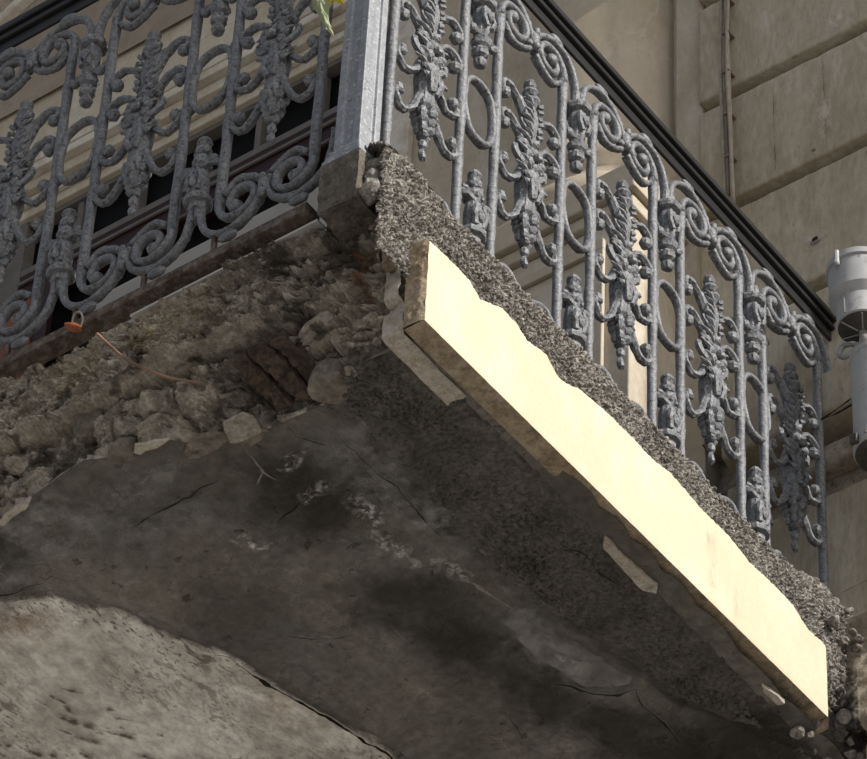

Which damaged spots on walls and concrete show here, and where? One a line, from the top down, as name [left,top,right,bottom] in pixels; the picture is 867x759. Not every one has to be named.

spalling [358,140,858,712]
water stain [0,499,112,555]
crack [131,481,218,528]
water stain [252,430,406,536]
crack [288,427,440,536]
spalling [0,223,821,759]
crack [216,653,395,759]
water stain [370,578,804,759]